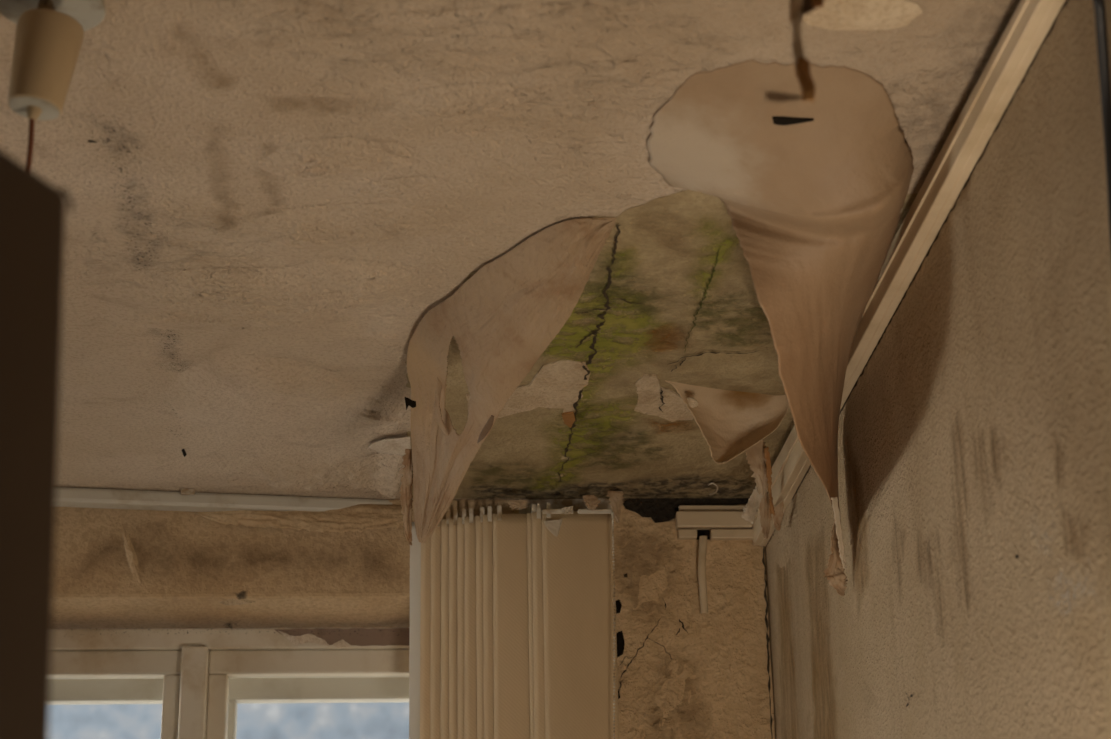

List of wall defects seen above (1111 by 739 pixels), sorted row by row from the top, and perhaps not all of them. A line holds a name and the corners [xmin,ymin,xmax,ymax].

crack [555,225,645,485]
water stain [476,476,752,500]
peeling [399,60,918,739]
crack [618,603,688,699]